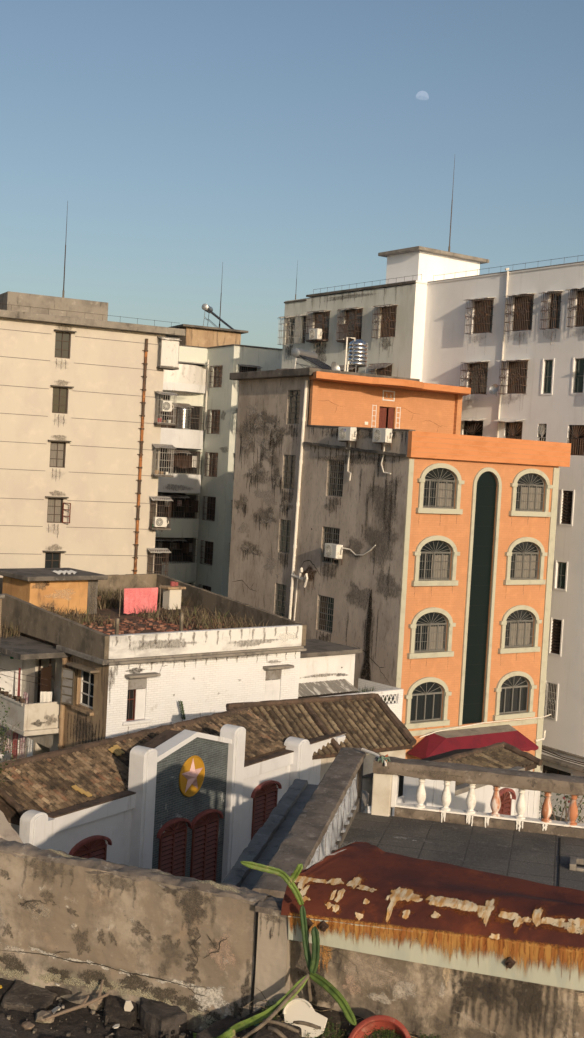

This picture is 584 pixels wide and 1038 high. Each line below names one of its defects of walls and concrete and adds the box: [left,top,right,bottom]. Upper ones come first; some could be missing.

leakage [234,412,297,530]
leakage [301,560,338,591]
leakage [310,428,400,681]
leakage [110,629,296,682]
leakage [162,886,216,926]
corrosion [281,796,584,975]
peeling [294,849,584,941]
leakage [177,912,280,1017]
leakage [298,948,337,1006]
leakage [437,969,578,1038]